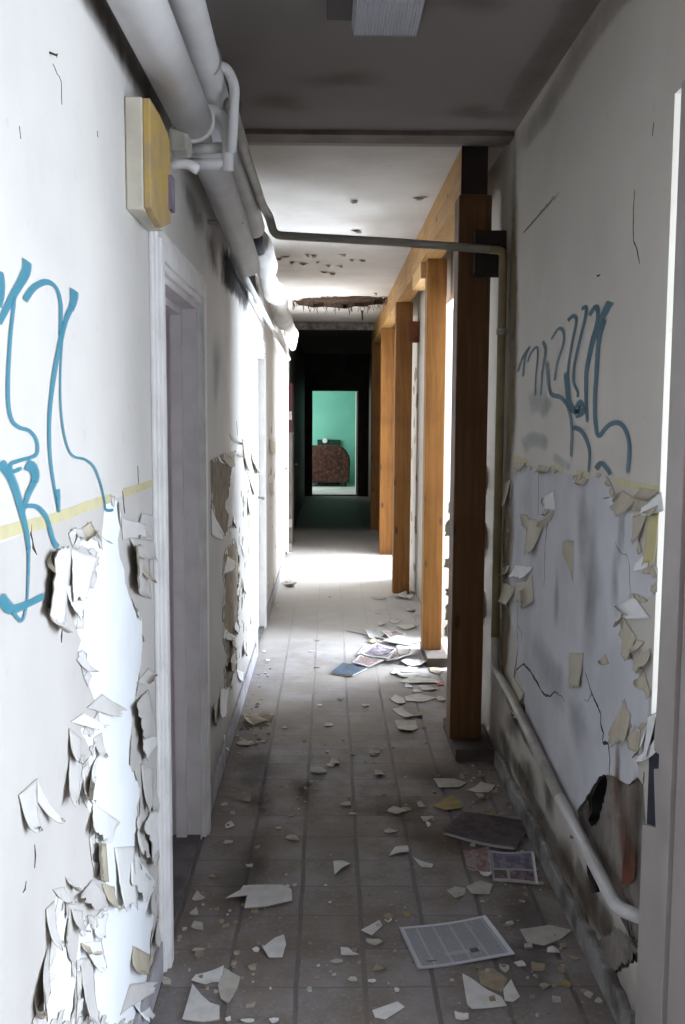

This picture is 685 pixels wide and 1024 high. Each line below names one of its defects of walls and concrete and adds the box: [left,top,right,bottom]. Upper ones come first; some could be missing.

peeling [276,254,365,275]
flaking render [292,293,387,315]
crack [632,190,640,264]
peeling [210,433,283,752]
peeling [18,779,66,833]
peeling [32,495,162,1024]
crack [513,616,610,771]
peeling [483,462,664,909]